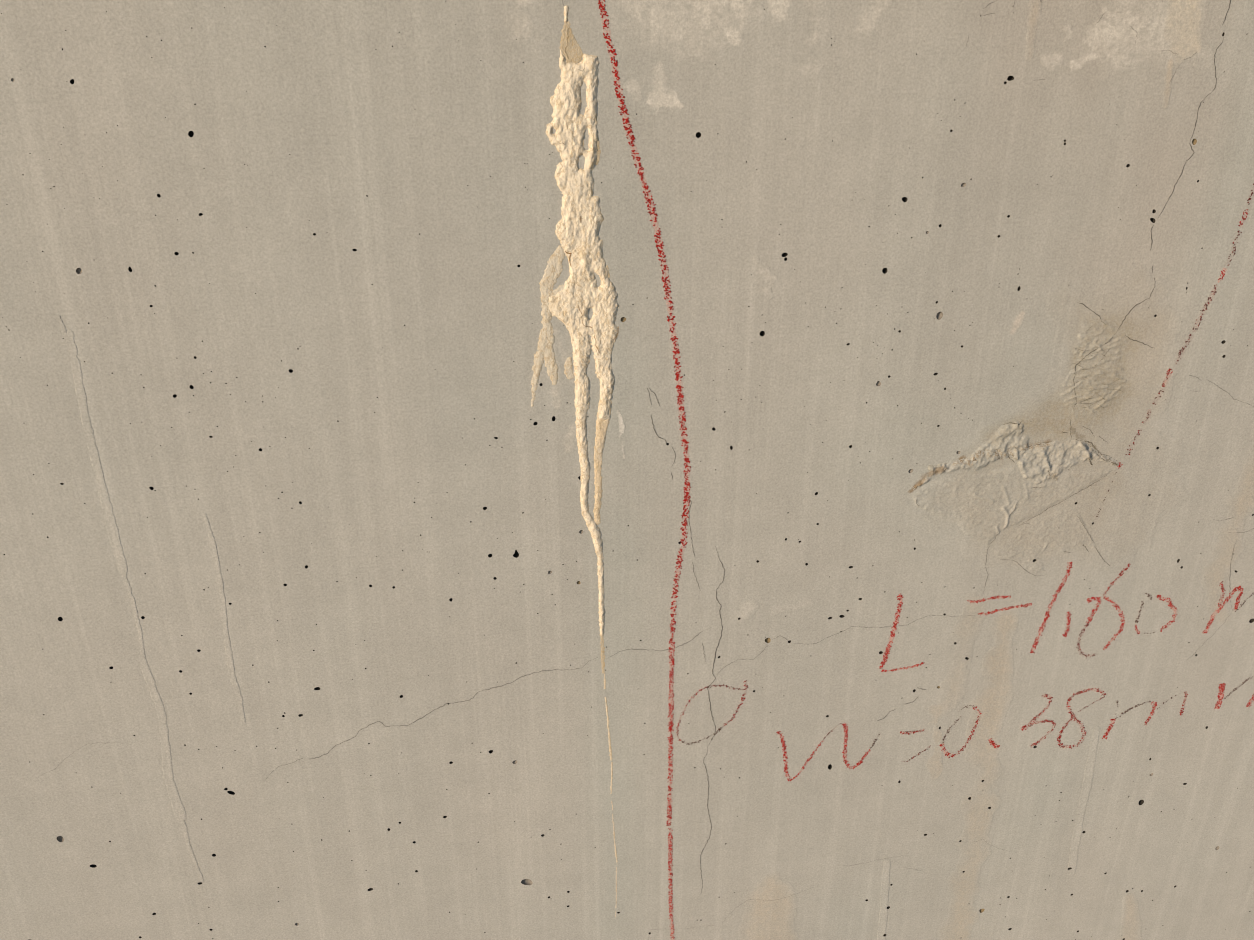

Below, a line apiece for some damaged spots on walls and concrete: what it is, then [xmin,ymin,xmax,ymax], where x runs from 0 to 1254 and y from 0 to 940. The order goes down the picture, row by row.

efflorescence [605,0,831,117]
efflorescence [1039,0,1217,82]
efflorescence [527,6,625,917]